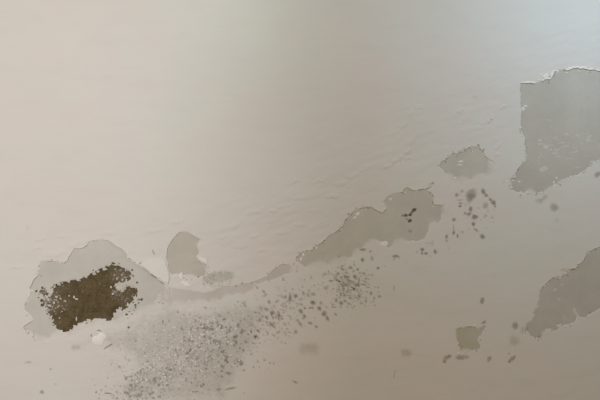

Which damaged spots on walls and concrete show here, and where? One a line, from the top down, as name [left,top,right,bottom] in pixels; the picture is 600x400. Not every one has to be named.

peeling [439,143,496,182]
peeling [503,66,600,197]
damp [115,300,249,400]
peeling [22,182,450,343]
peeling [443,321,487,363]
peeling [527,246,600,338]